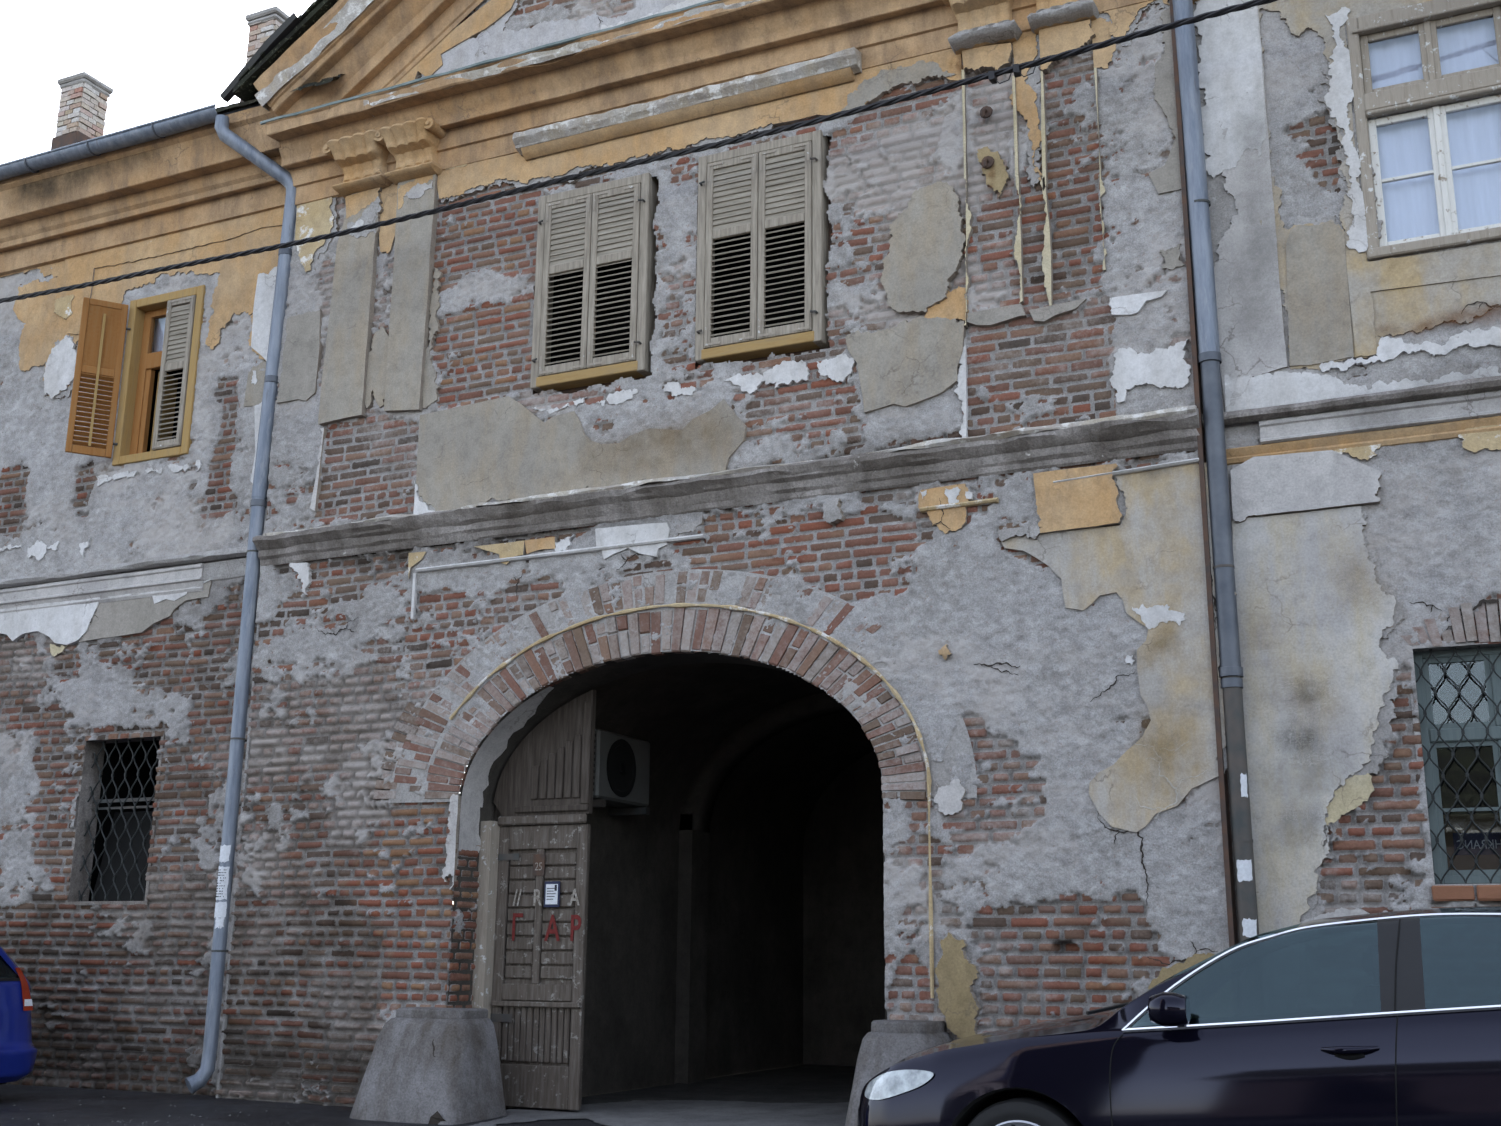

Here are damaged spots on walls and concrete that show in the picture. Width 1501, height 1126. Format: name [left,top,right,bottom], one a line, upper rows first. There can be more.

peeling [1193,0,1501,412]
spalling [13,0,1191,558]
peeling [1334,444,1381,461]
peeling [1458,425,1501,453]
spalling [0,462,59,561]
peeling [0,579,212,657]
peeling [289,563,313,595]
peeling [408,552,427,579]
peeling [474,535,576,565]
spalling [932,730,1048,857]
spalling [333,686,554,1016]
spalling [937,890,1169,1034]